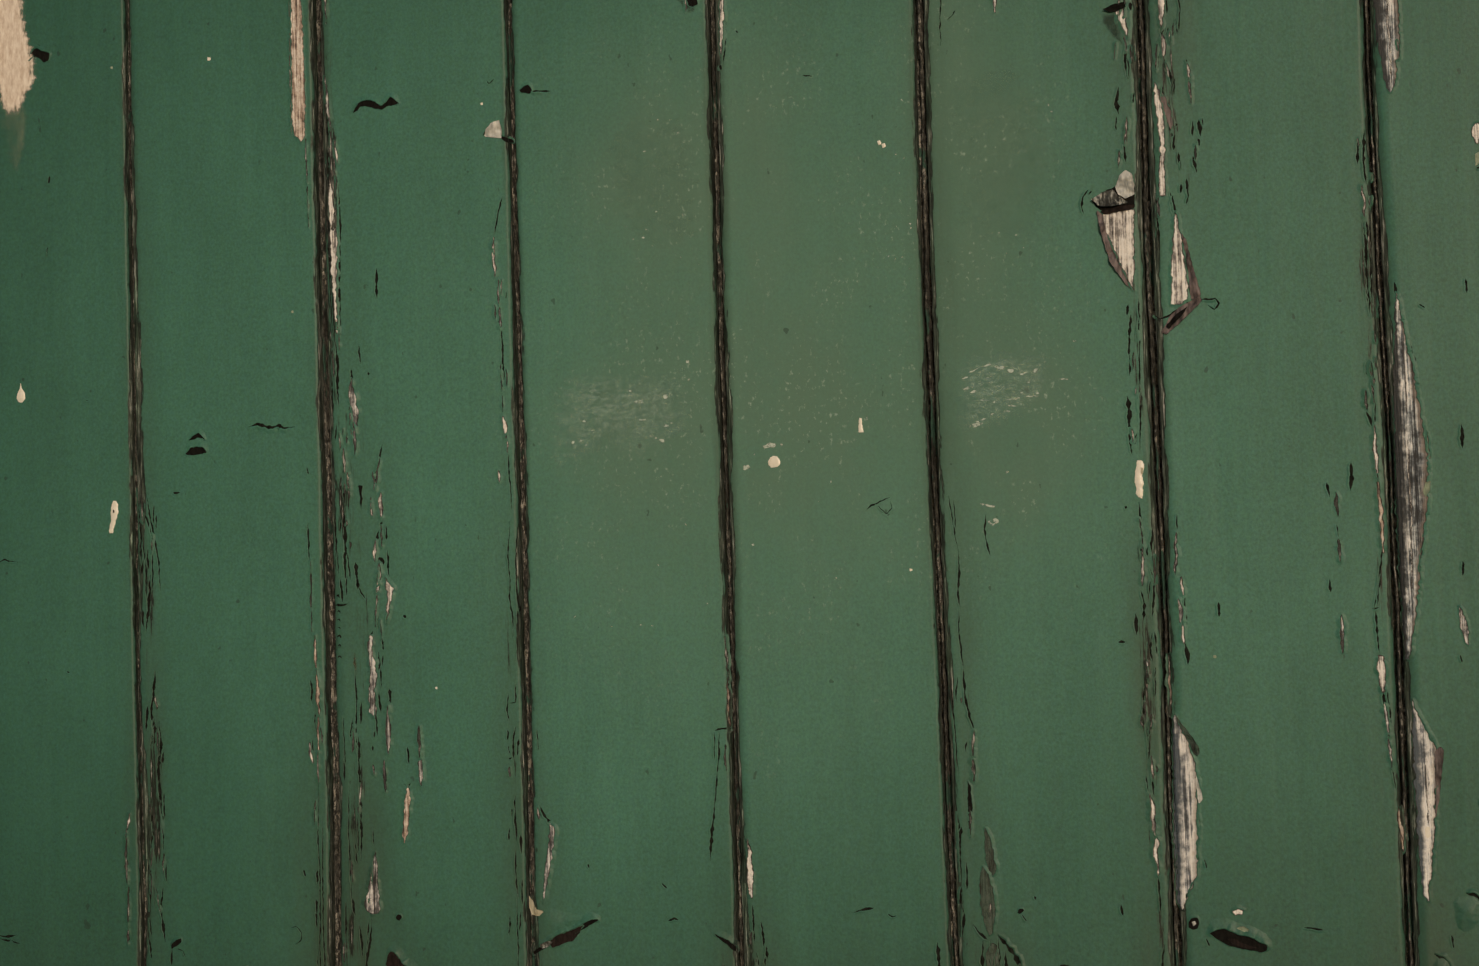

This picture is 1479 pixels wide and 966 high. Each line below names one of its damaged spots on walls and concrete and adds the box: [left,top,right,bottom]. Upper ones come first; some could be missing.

peeling [0,0,52,113]
peeling [1372,0,1404,94]
peeling [1078,0,1220,334]
peeling [286,0,427,846]
peeling [1323,462,1354,592]
peeling [1335,611,1349,656]
peeling [1369,282,1444,904]
peeling [1135,502,1203,914]
peeling [361,830,419,966]
peeling [529,805,602,956]
peeling [1205,904,1273,953]